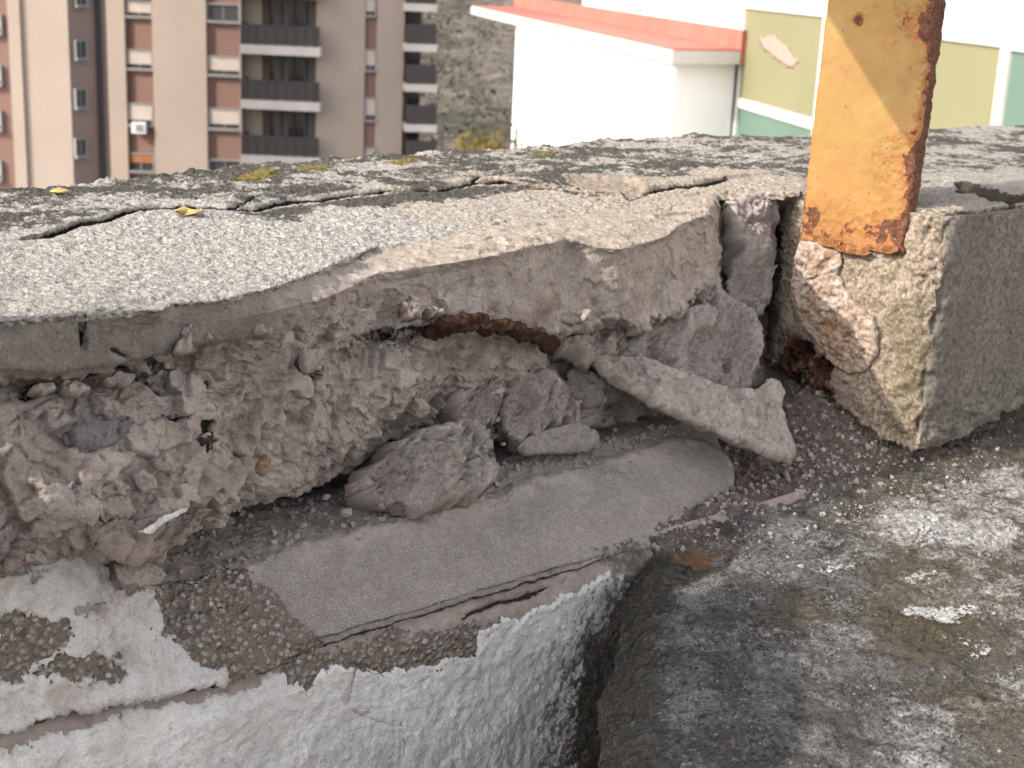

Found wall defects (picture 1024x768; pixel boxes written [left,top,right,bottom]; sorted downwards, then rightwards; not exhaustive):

crack [30,191,397,240]
crack [437,177,597,197]
crack [626,178,725,201]
corrosion [421,310,561,354]
corrosion [777,329,850,412]
spalling [0,172,801,735]
crack [296,561,599,657]
water stain [529,536,693,768]